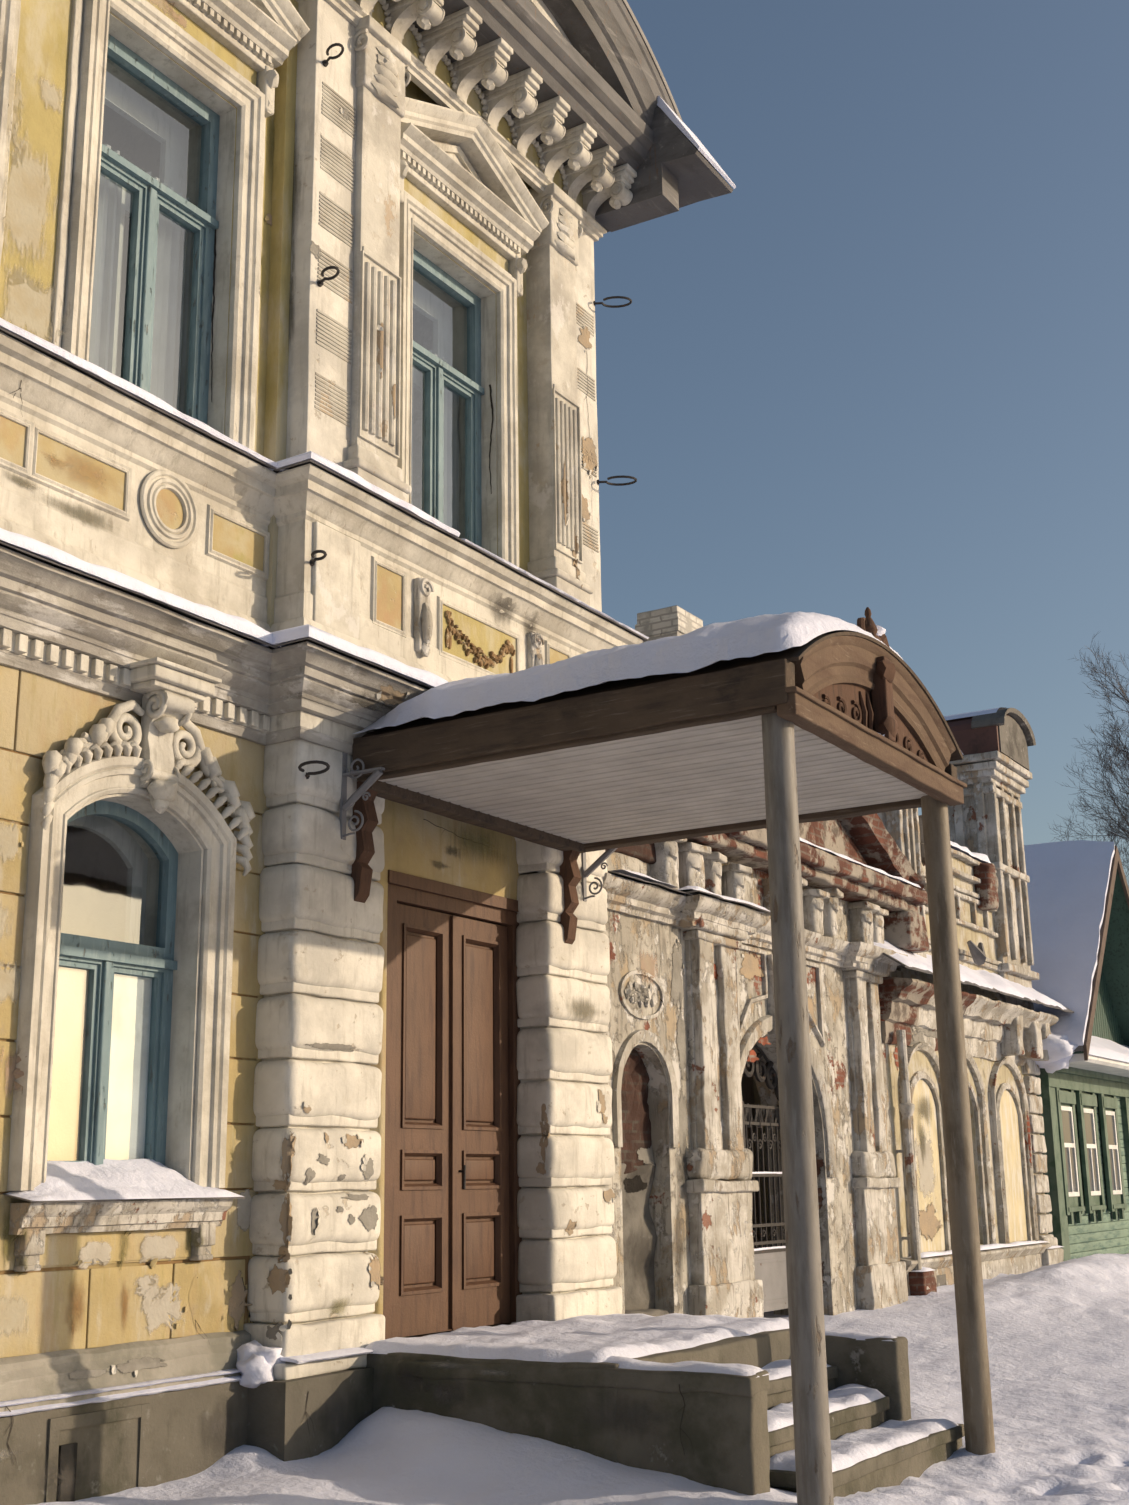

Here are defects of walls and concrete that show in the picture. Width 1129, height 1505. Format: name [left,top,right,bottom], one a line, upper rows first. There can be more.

flaking render [578,325,592,353]
crack [487,384,495,494]
flaking render [625,938,694,1162]
peeling [2,1052,27,1093]
flaking render [598,1089,608,1124]
flaking render [536,1104,550,1175]
flaking render [265,1131,379,1300]
flaking render [603,1189,616,1204]
flaking render [135,1235,188,1332]
flaking render [364,1252,384,1290]
spalling [266,1318,292,1341]